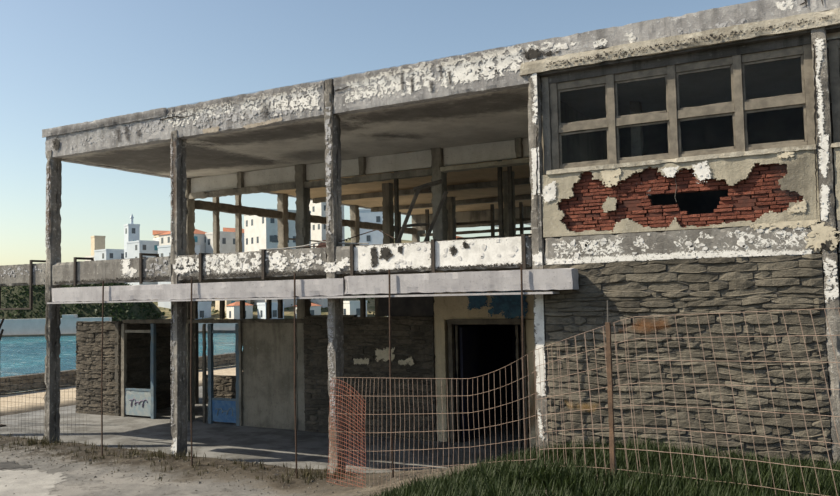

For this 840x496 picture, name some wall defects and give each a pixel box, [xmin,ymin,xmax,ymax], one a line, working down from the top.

peeling [775,0,794,11]
peeling [340,15,832,106]
flaking render [54,38,840,302]